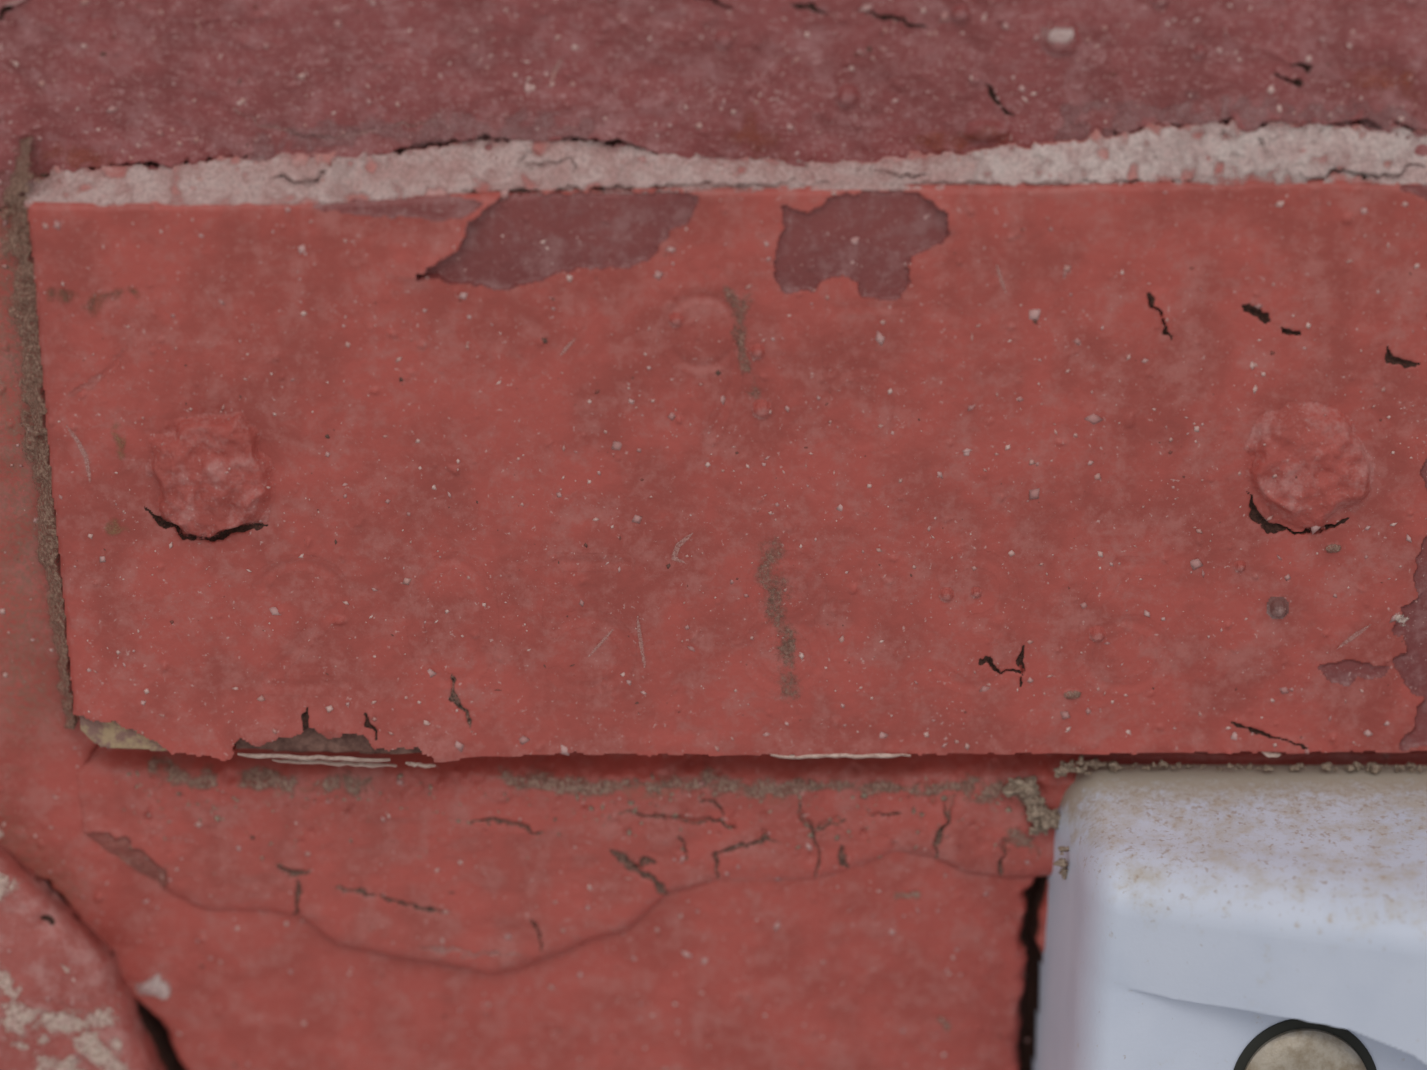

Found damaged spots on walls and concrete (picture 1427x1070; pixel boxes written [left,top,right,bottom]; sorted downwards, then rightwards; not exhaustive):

crack [790,3,828,14]
crack [865,10,926,29]
peeling [1400,184,1427,201]
peeling [313,189,698,290]
peeling [774,189,950,301]
peeling [1318,537,1427,751]
crack [301,707,309,730]
crack [364,713,378,740]
crack [471,817,543,835]
crack [933,794,955,858]
crack [610,799,900,895]